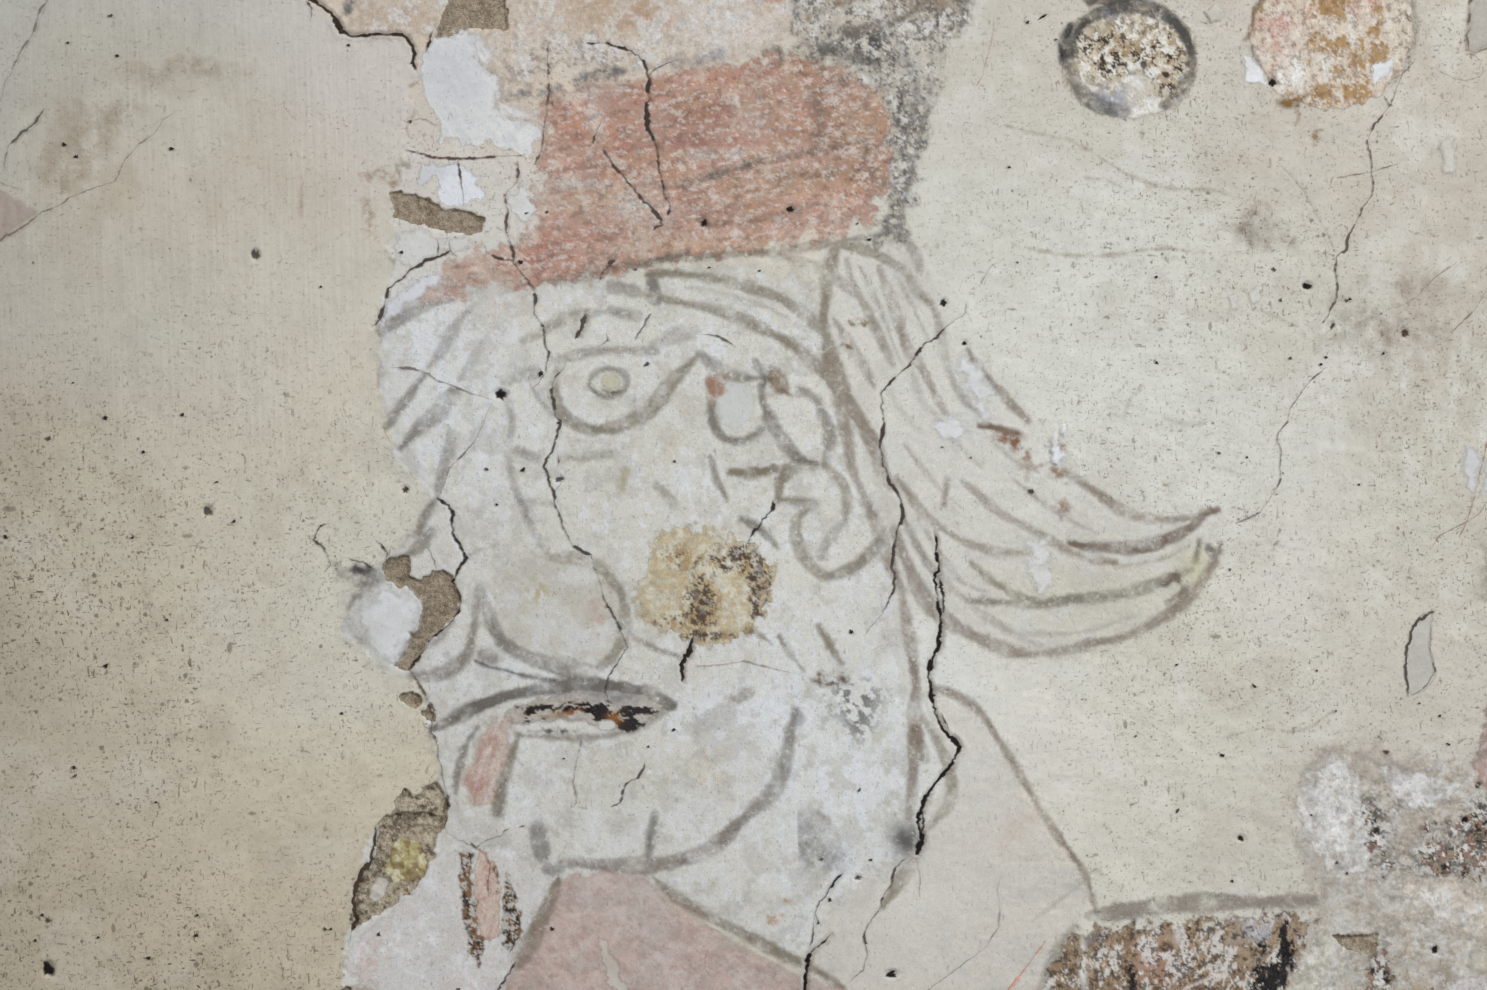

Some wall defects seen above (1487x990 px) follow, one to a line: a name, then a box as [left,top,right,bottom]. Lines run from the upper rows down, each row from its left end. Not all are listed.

peeling [1243,55,1276,87]
peeling [379,0,549,326]
crack [588,42,671,230]
crack [399,47,651,555]
spalling [359,555,461,671]
spalling [399,691,436,725]
crack [603,595,628,693]
crack [856,329,962,976]
spalling [350,781,450,936]
peeling [1413,782,1487,882]
crack [804,874,842,990]
peeling [1332,933,1396,990]